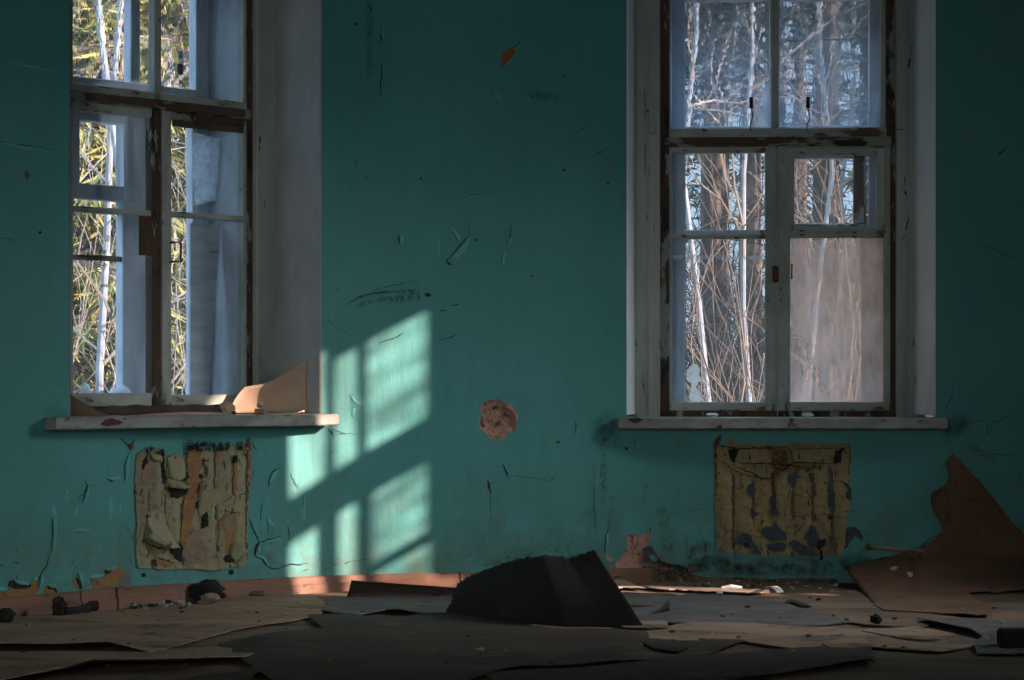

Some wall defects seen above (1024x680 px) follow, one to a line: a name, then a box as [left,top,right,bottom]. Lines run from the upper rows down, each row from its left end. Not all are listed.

flaking render [479,398,519,439]
peeling [0,576,58,598]
crack [0,485,78,588]
peeling [72,444,252,589]
crack [249,442,365,571]
flaking render [606,528,838,583]
peeling [714,439,863,560]